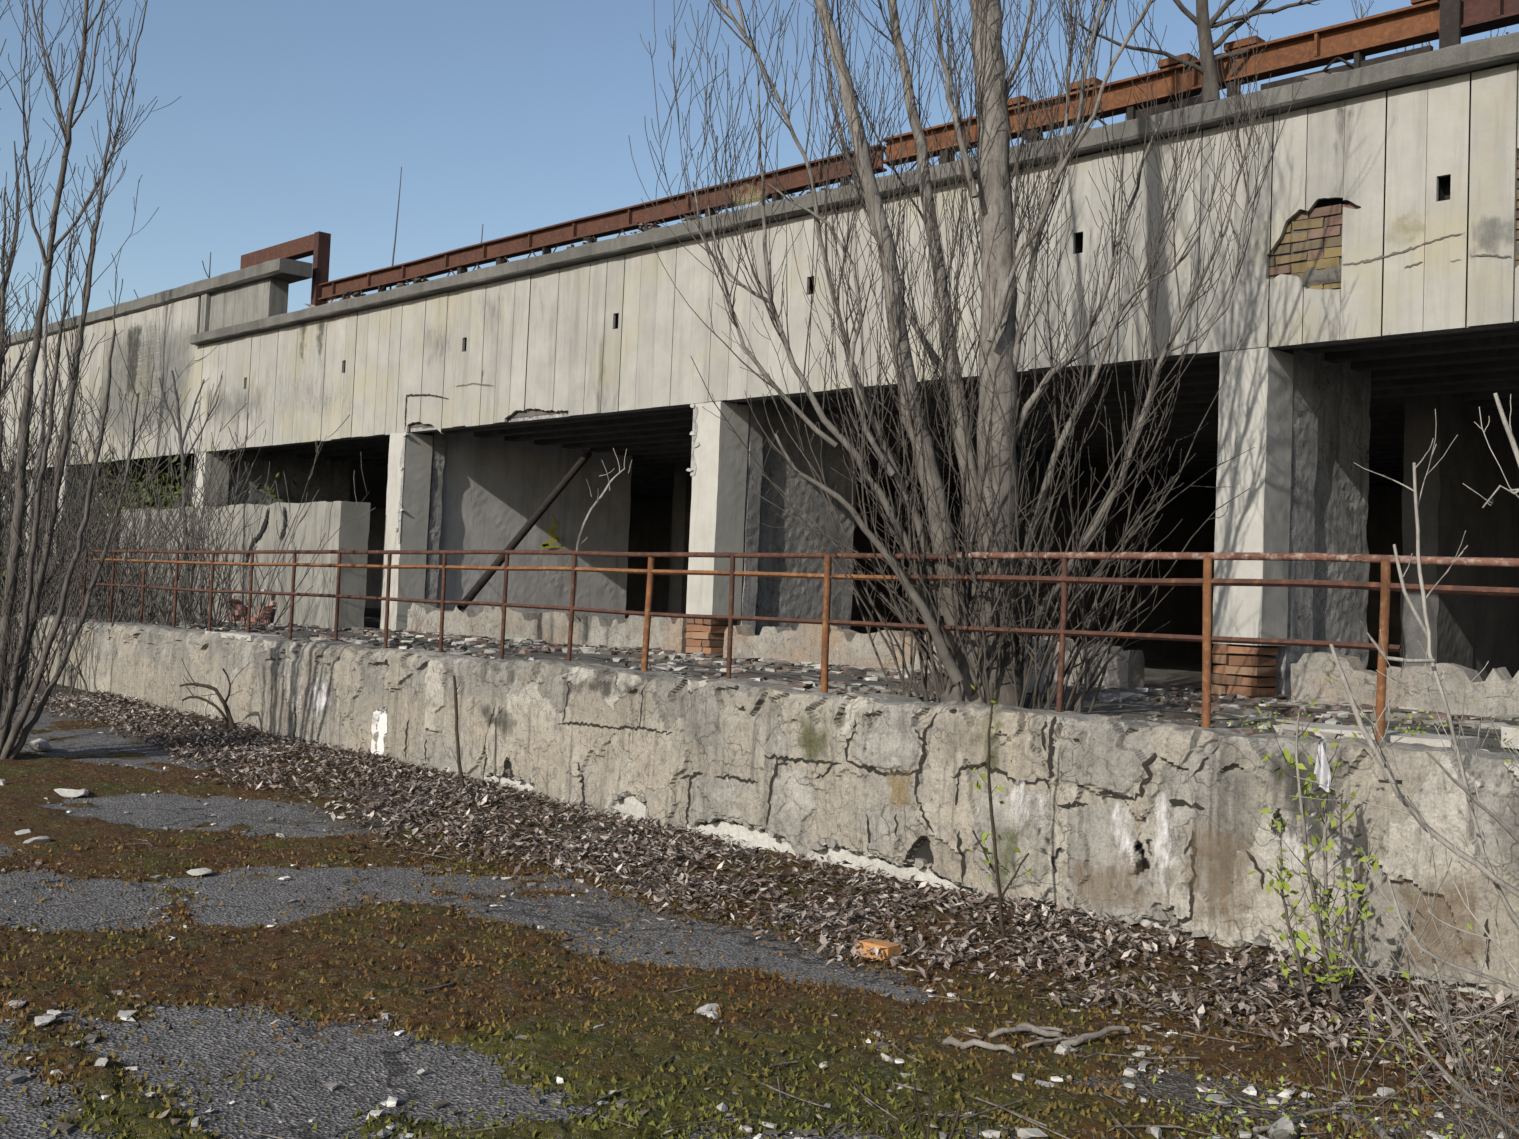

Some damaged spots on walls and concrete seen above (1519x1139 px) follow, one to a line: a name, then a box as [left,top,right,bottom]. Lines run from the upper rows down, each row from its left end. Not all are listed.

flaking render [1268,203,1361,303]
crack [559,681,672,735]
crack [483,709,494,779]
crack [577,763,585,803]
crack [680,713,1218,929]
crack [1246,850,1264,889]